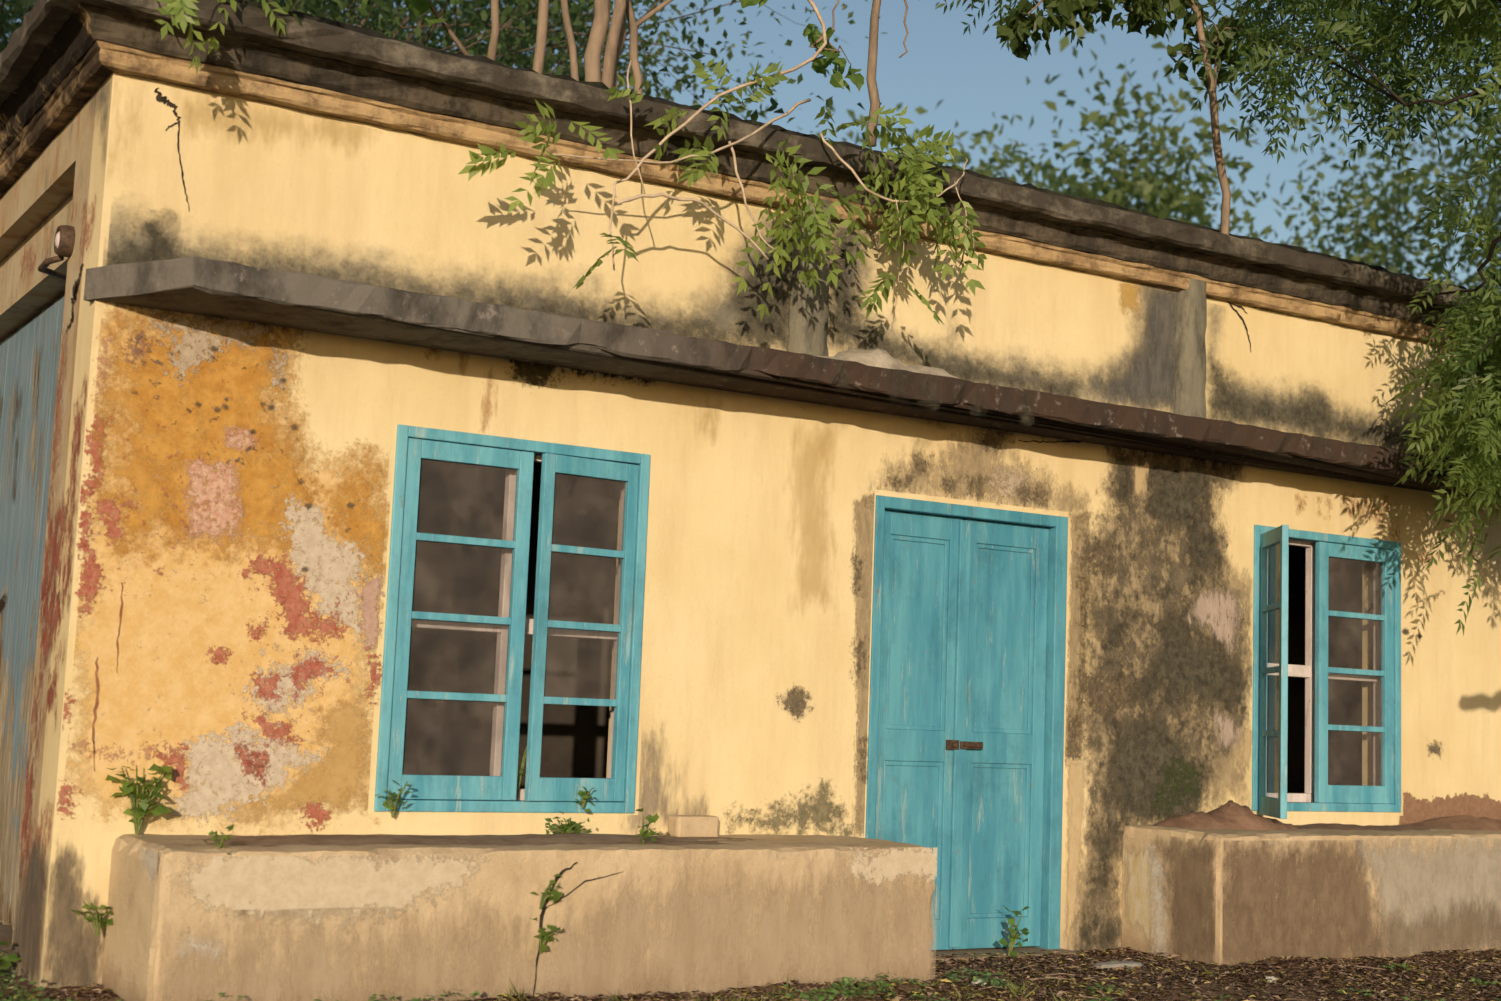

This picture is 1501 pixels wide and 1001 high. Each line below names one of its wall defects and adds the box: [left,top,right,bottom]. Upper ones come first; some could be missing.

crack [154,88,190,212]
damp [106,222,793,347]
damp [507,360,655,388]
damp [877,432,1086,511]
damp [829,225,1177,425]
damp [1211,365,1466,456]
peeling [20,305,389,889]
damp [777,686,813,719]
damp [1066,446,1501,965]
peeling [180,855,485,929]